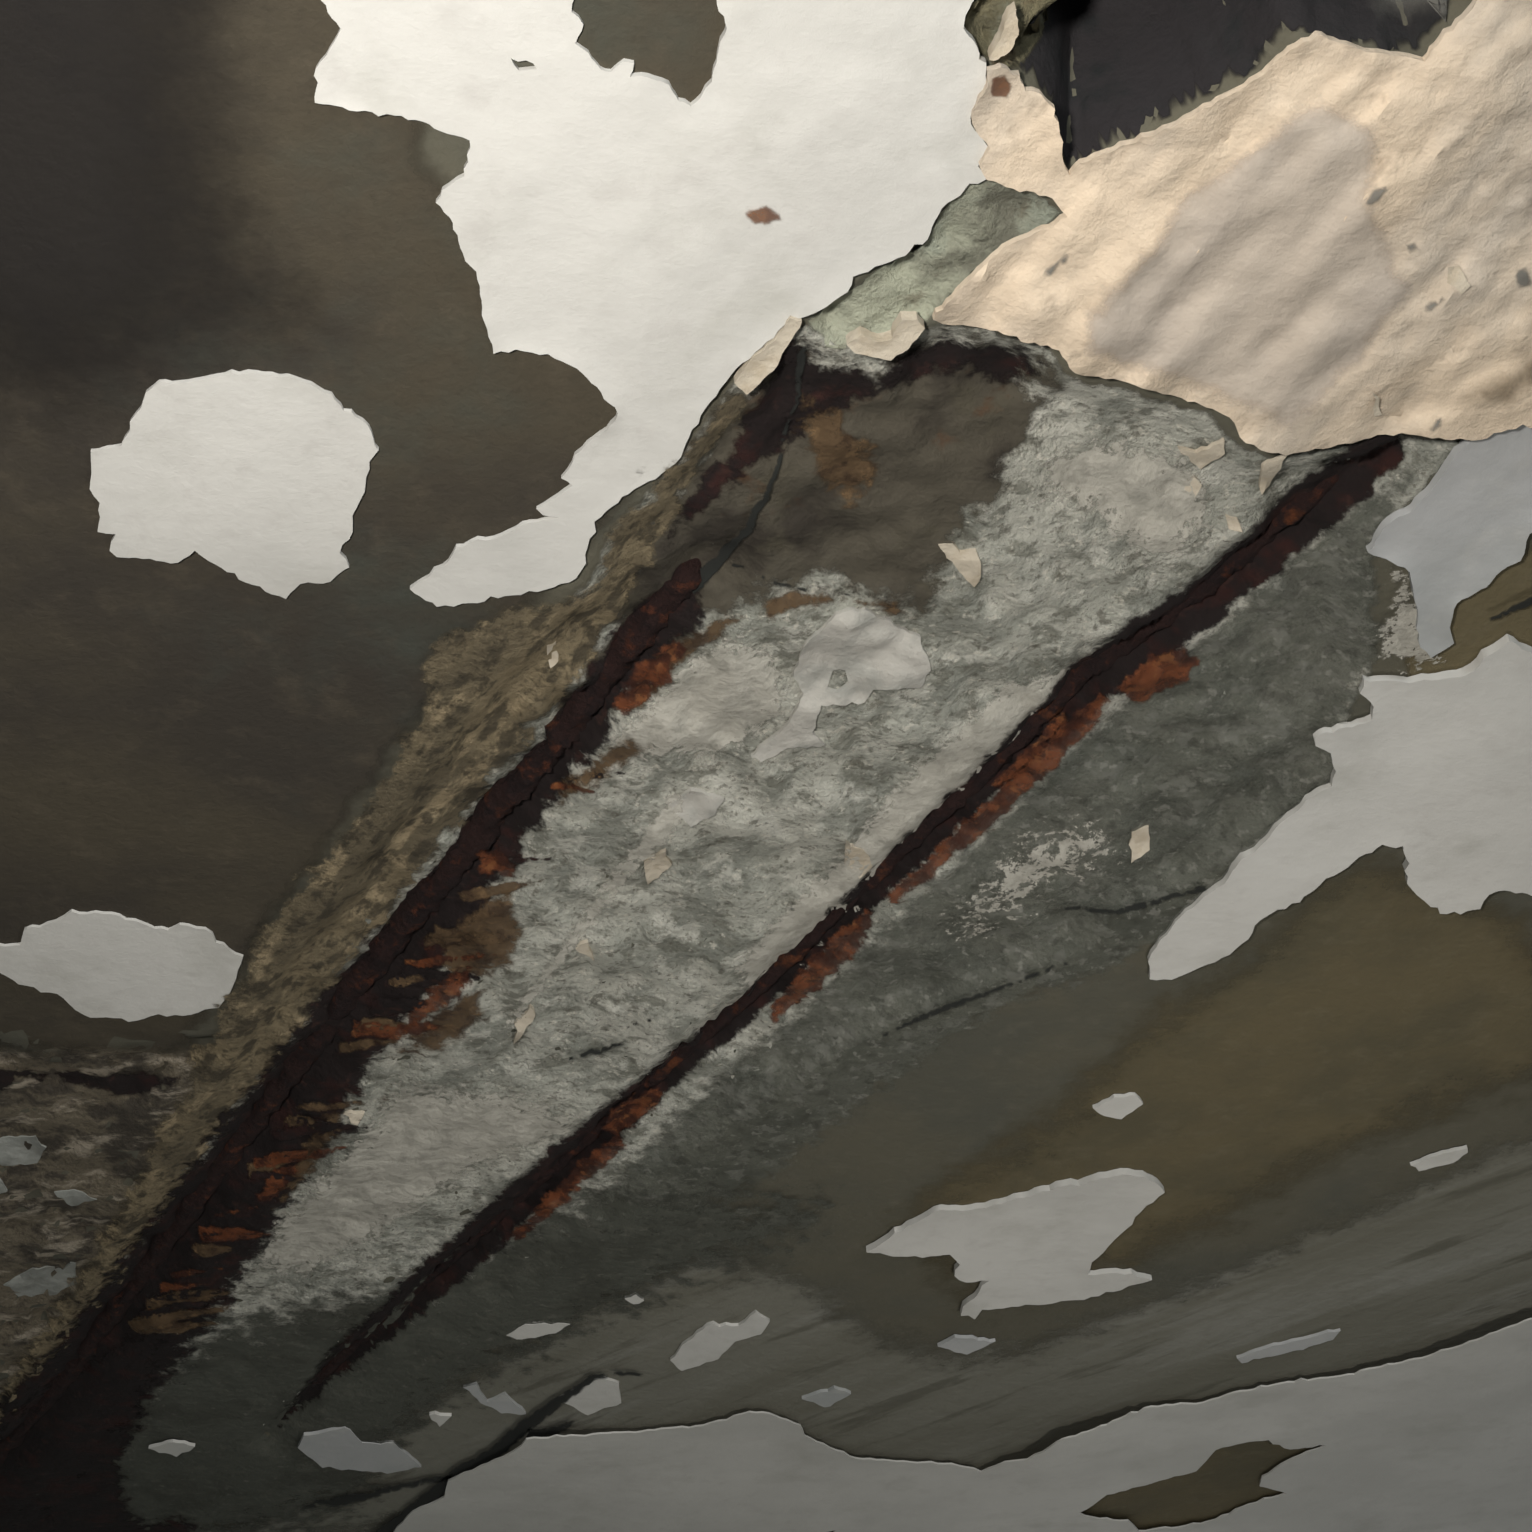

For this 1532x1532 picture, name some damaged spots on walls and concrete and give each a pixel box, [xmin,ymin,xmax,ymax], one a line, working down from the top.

peeling [148,1439,195,1457]
peeling [0,0,617,1395]
rust [0,592,739,1532]
water stain [112,478,1442,1532]
spalling [159,0,1448,1384]
water stain [553,328,1063,783]
rust [277,433,1405,1428]
water stain [1039,438,1211,570]
water stain [1090,109,1409,422]